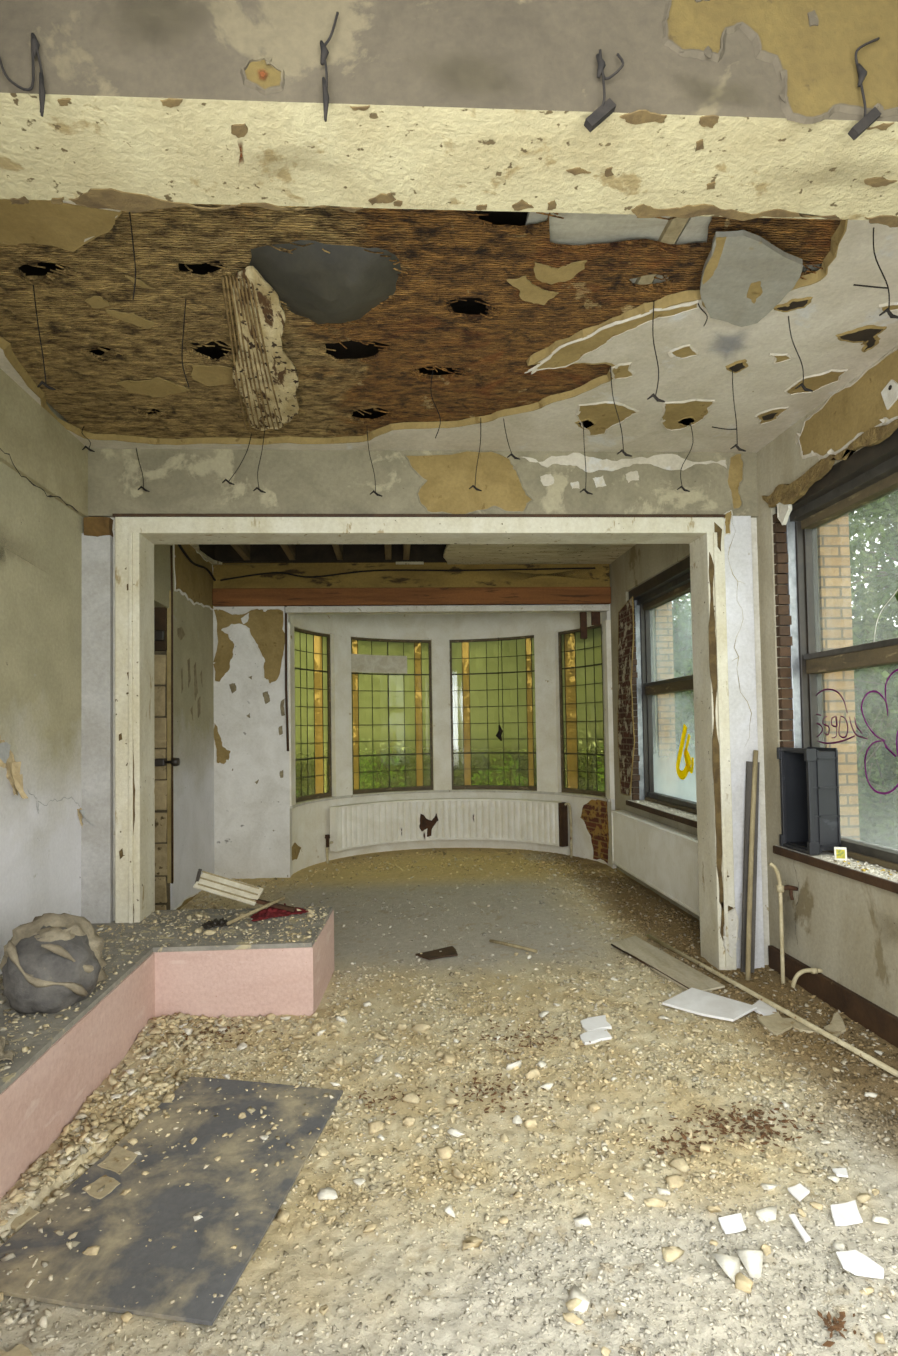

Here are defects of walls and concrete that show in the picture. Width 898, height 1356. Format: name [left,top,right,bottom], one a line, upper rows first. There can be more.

peeling [662,0,898,130]
spalling [619,110,667,125]
spalling [695,115,719,152]
peeling [0,188,402,252]
peeling [525,300,702,374]
spalling [773,297,813,312]
peeling [574,401,639,437]
peeling [659,399,717,431]
peeling [754,302,898,525]
crack [0,448,79,513]
peeling [173,544,285,735]
peeling [404,450,744,957]